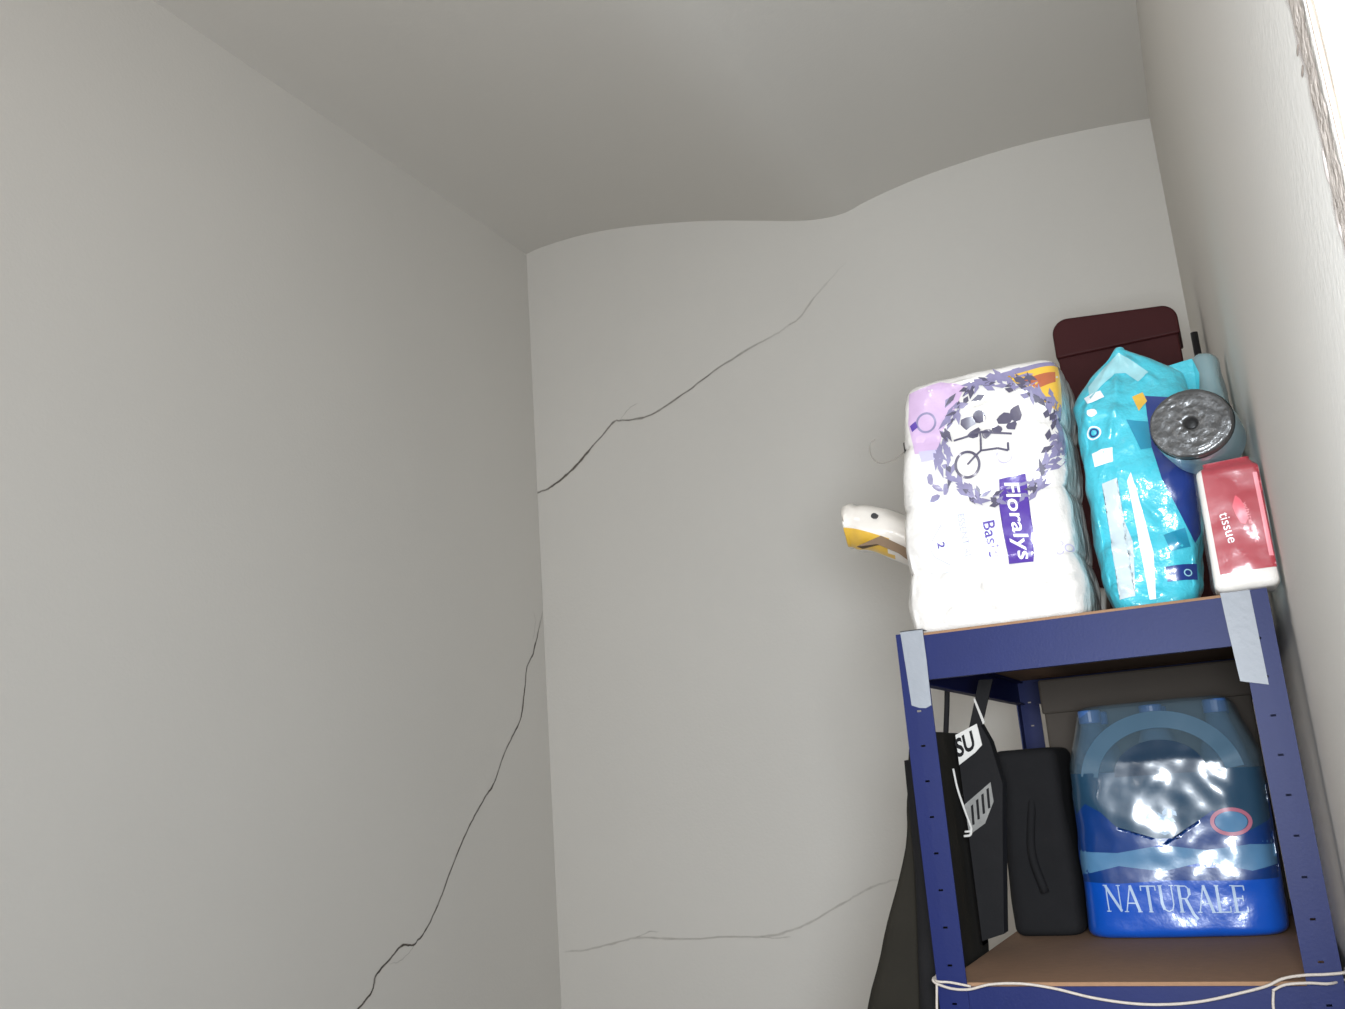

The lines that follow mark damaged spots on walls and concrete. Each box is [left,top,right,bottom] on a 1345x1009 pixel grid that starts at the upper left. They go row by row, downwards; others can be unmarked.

crack [538,374,710,493]
crack [358,631,539,1009]